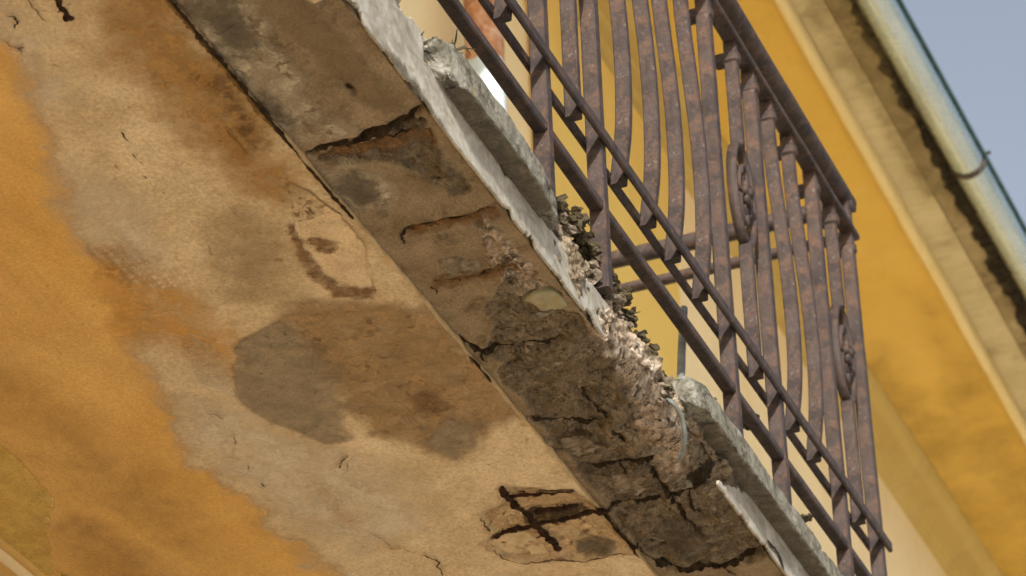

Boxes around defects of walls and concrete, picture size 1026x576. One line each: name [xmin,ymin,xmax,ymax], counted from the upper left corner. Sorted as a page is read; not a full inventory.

damp [186,0,352,139]
crack [165,0,419,219]
damp [233,301,516,458]
peeling [0,0,763,576]
crack [400,207,484,244]
crack [531,386,785,576]